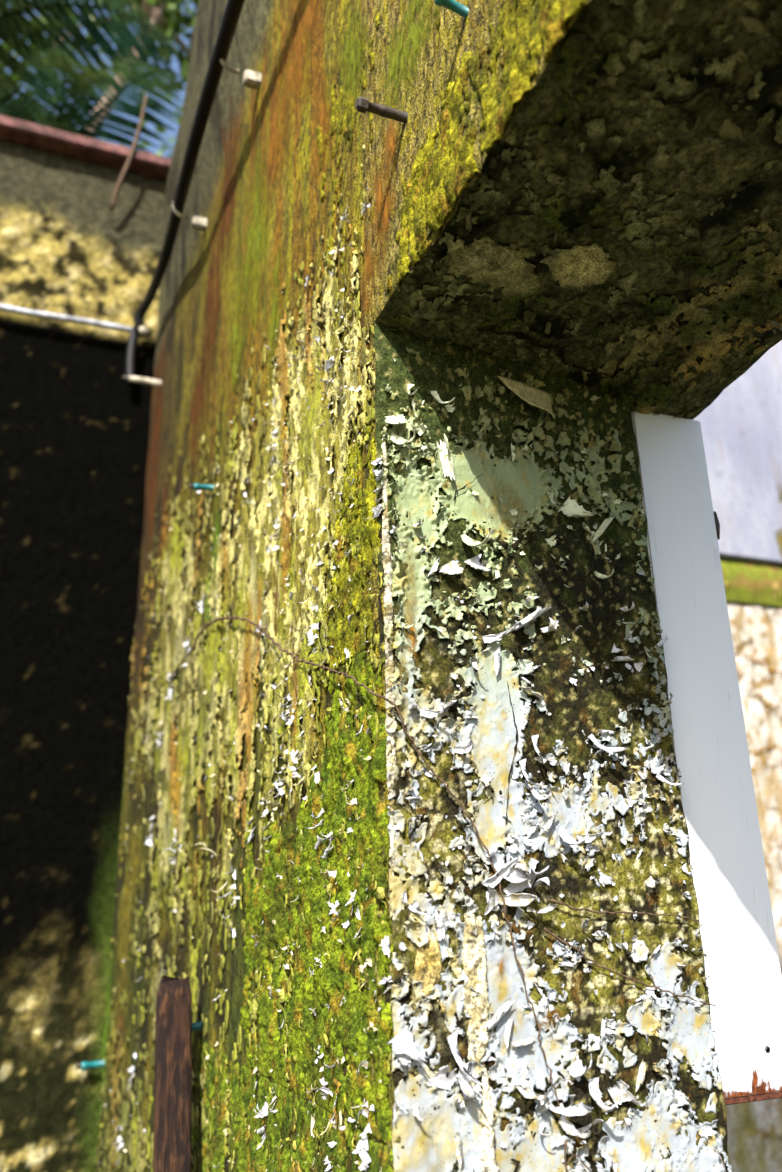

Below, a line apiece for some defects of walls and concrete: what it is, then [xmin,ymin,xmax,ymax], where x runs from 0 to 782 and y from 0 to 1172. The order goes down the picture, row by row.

peeling [707,118,742,149]
rust [190,123,236,452]
damp [288,498,299,575]
peeling [142,187,729,1172]
peeling [112,1053,146,1166]
rust [723,1069,782,1098]